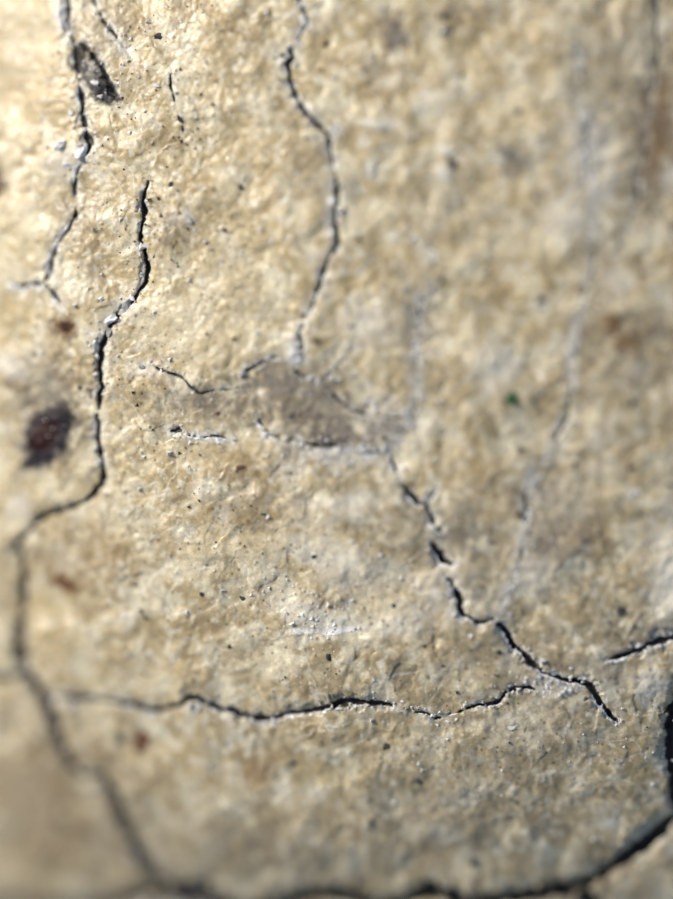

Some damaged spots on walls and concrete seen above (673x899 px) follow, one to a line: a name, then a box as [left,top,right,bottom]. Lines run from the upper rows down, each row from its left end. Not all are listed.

crack [74,86,94,162]
crack [137,181,150,244]
crack [95,248,151,410]
crack [443,577,495,626]
crack [0,413,176,899]
crack [51,694,393,725]
crack [466,685,535,709]
crack [494,621,619,726]
crack [606,633,673,664]
crack [661,701,673,805]
crack [159,877,231,899]
crack [405,813,673,899]